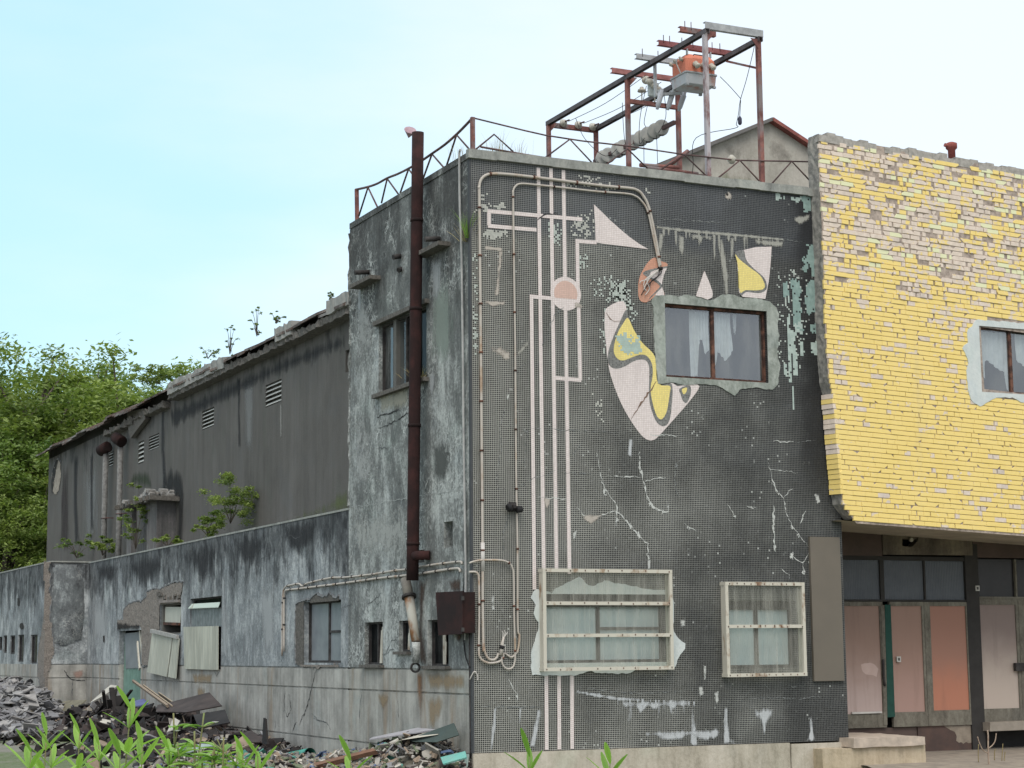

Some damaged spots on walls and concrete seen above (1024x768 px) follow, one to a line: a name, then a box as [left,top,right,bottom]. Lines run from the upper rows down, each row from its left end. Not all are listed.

peeling [776,193,811,213]
peeling [777,244,817,410]
damp [162,341,338,482]
damp [381,391,407,408]
crack [487,307,696,561]
damp [190,549,215,581]
damp [287,525,314,550]
crack [728,440,811,579]
flaking render [117,580,184,668]